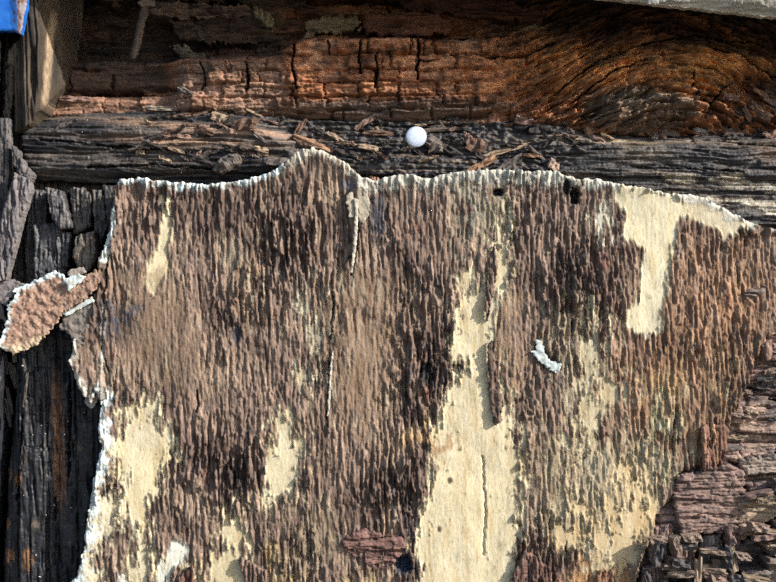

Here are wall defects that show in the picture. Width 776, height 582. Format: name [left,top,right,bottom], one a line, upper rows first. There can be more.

crack [290,43,298,89]
crack [358,41,378,88]
peeling [145,188,174,296]
peeling [224,239,266,332]
peeling [292,267,405,446]
peeling [402,180,776,582]
peeling [80,387,314,582]
peeling [264,516,336,582]